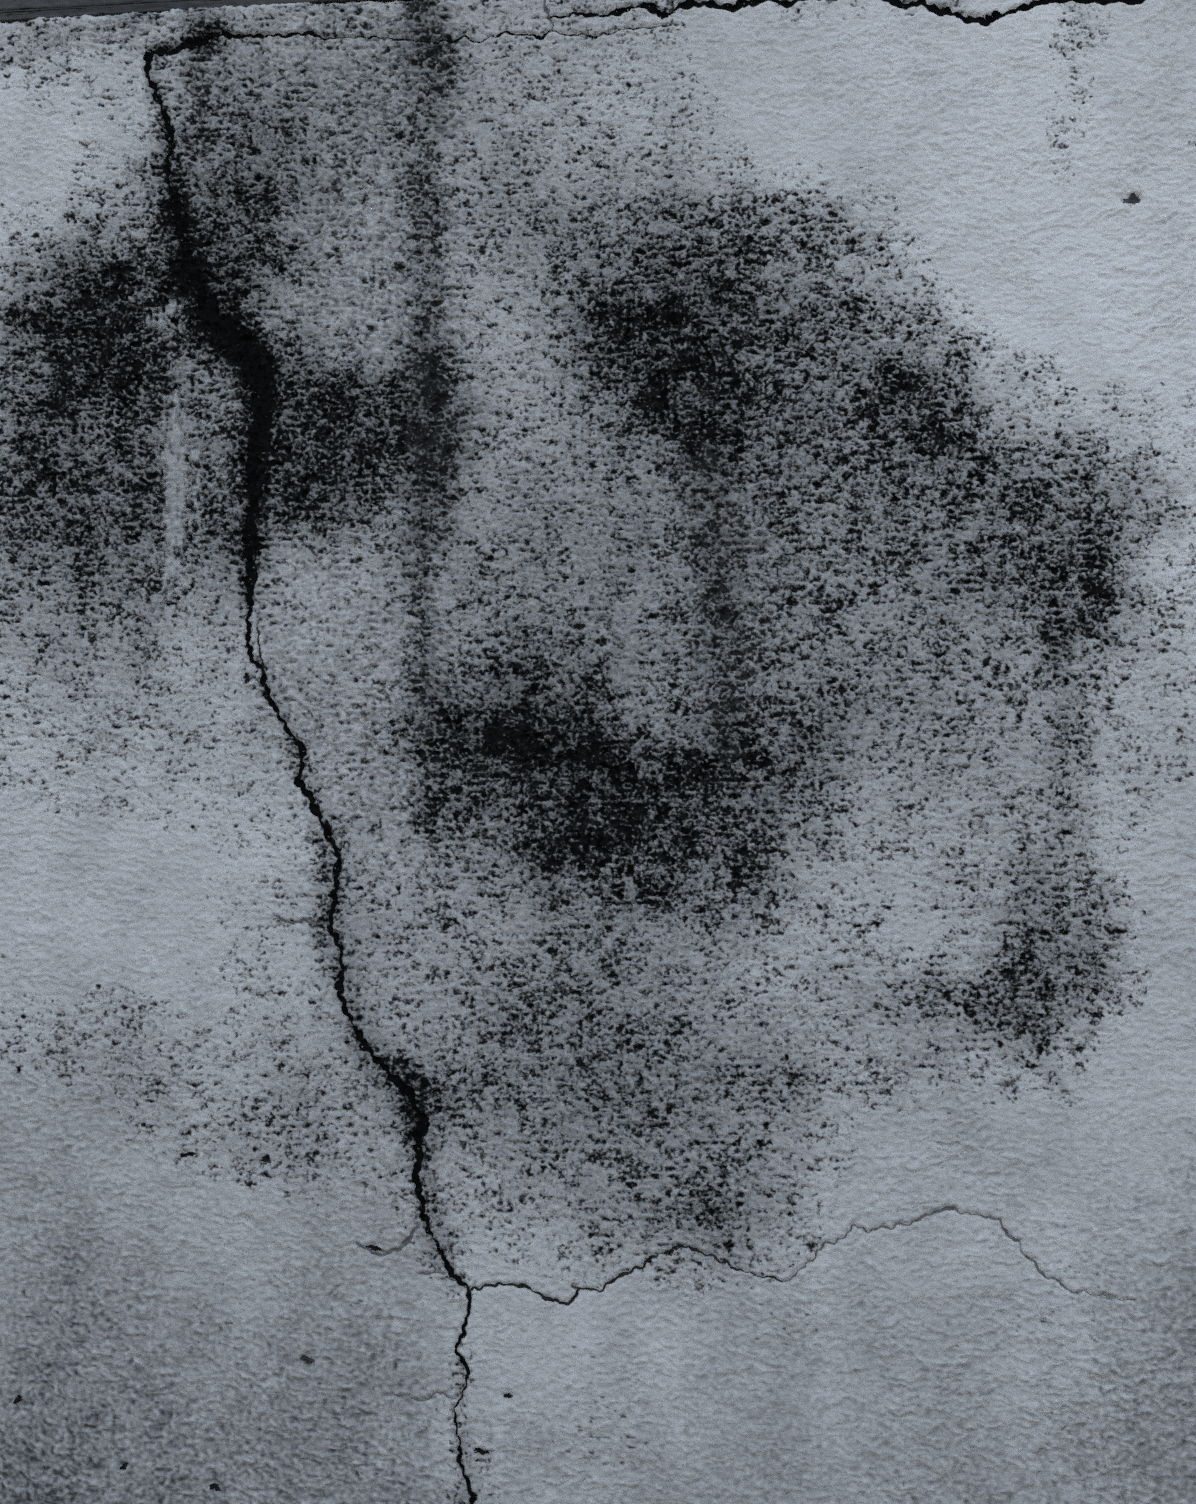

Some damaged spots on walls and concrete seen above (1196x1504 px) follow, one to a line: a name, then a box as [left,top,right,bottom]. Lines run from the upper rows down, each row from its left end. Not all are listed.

crack [544,0,805,39]
crack [882,0,1144,26]
water stain [1046,3,1113,175]
crack [143,30,550,1504]
water stain [791,961,862,1033]
water stain [0,984,179,1106]
water stain [155,1004,246,1076]
water stain [187,1065,237,1110]
water stain [914,1040,960,1094]
crack [468,1206,1120,1305]